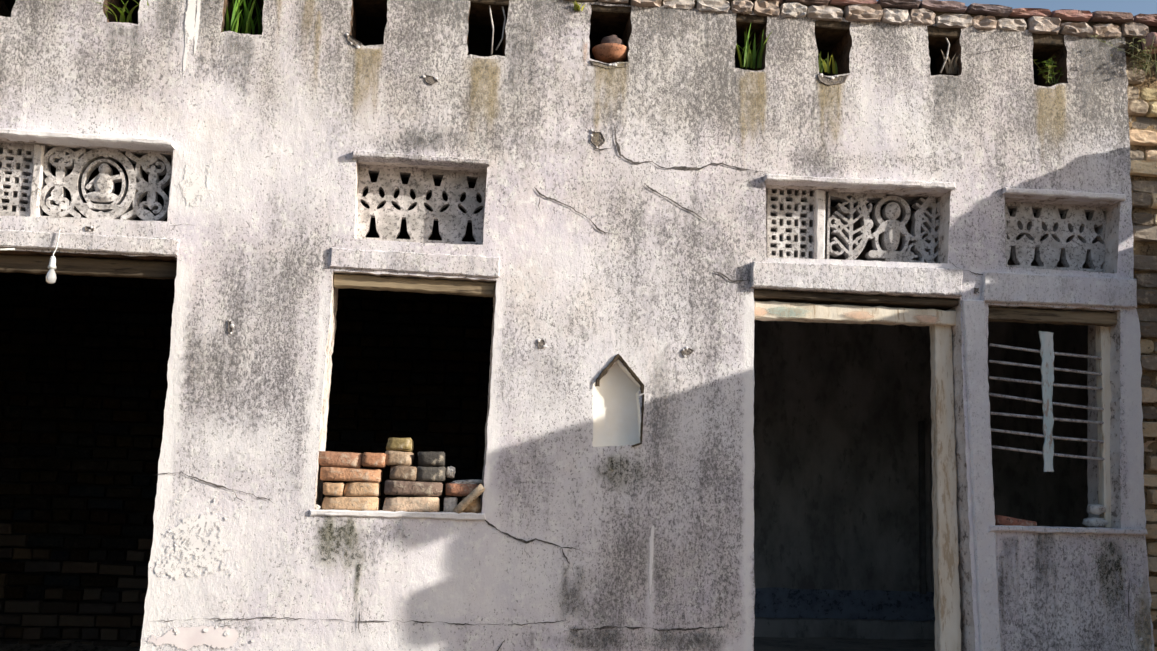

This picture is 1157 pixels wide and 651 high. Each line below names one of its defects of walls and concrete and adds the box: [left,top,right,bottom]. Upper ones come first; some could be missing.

water stain [472,0,571,115]
crack [534,187,619,235]
crack [591,126,762,225]
crack [157,464,275,504]
water stain [319,516,361,595]
crack [485,520,584,564]